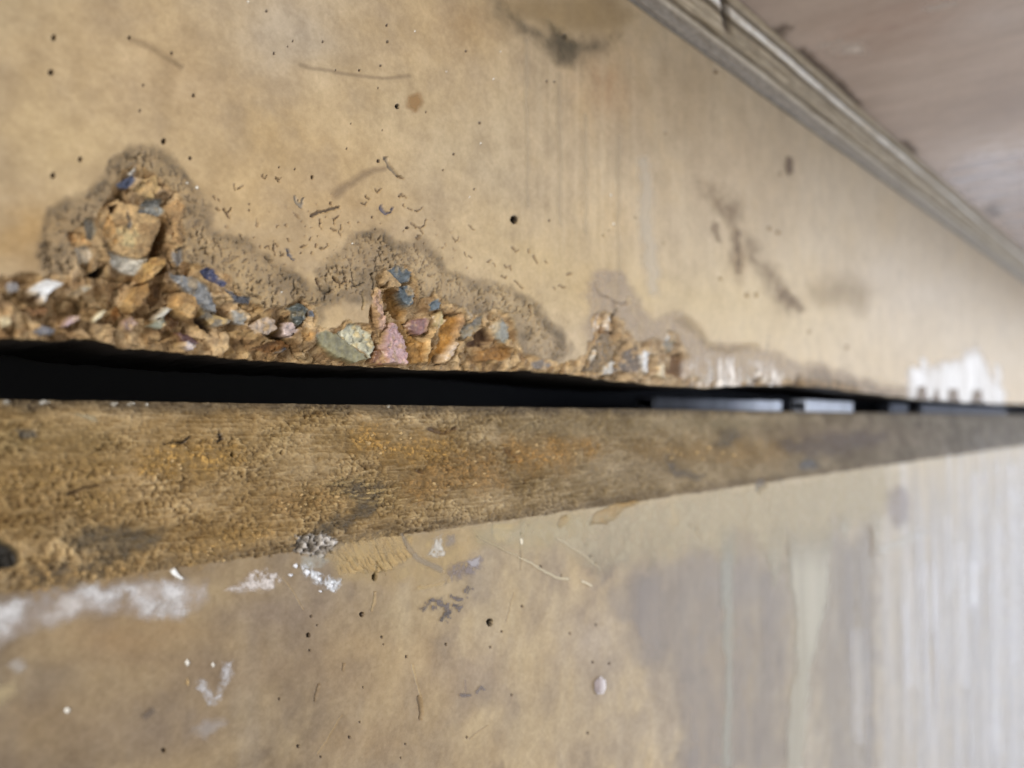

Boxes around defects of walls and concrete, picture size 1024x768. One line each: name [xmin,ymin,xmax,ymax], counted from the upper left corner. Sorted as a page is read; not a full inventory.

spalling [0,156,859,392]
water stain [231,563,340,592]
water stain [43,587,113,619]
water stain [132,584,200,613]
water stain [0,606,21,636]
water stain [789,553,828,768]